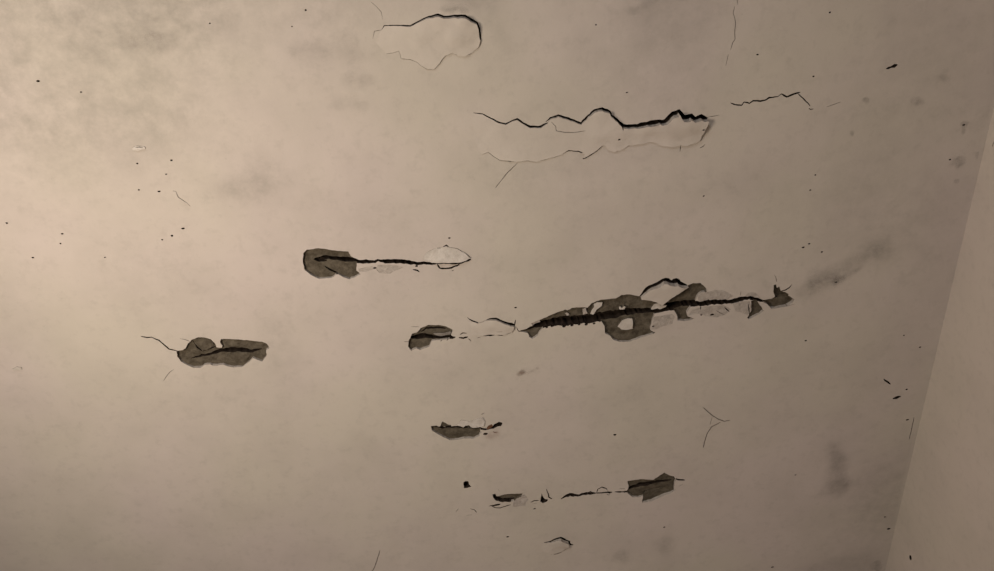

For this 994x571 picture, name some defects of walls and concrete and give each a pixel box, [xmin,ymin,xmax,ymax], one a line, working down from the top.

crack [731,92,840,110]
flaking render [303,237,471,279]
flaking render [405,276,794,351]
flaking render [141,336,269,380]
flaking render [431,413,502,440]
flaking render [490,473,684,509]